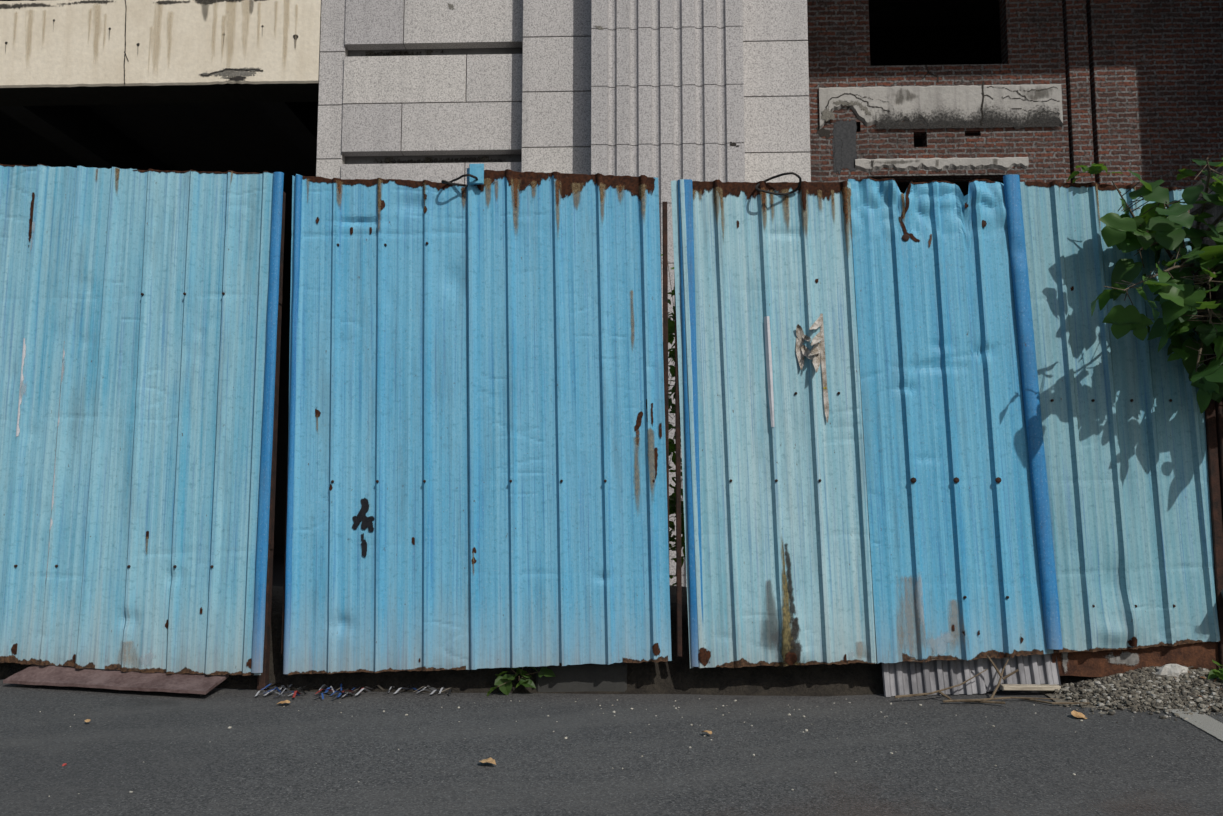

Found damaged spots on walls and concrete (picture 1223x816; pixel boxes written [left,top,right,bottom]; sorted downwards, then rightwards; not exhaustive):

water stain [0,0,113,9]
water stain [157,0,257,19]
water stain [874,90,1061,129]
corrosion [301,169,655,234]
corrosion [692,177,996,248]
corrosion [902,636,1221,672]